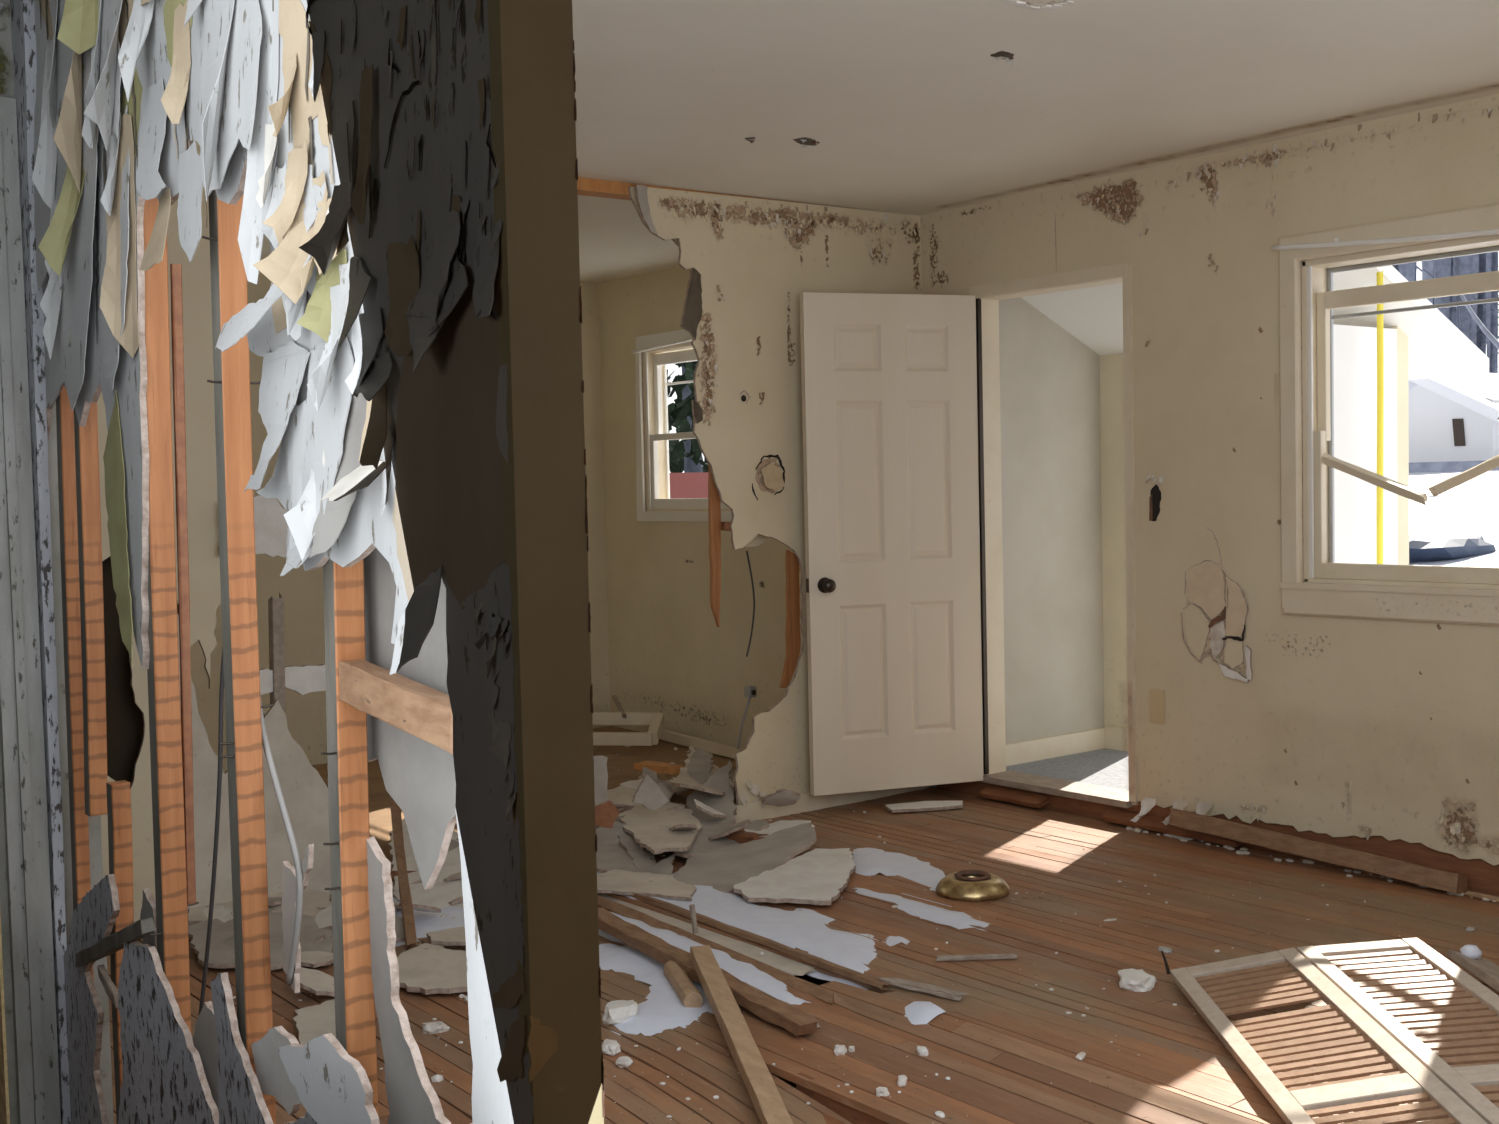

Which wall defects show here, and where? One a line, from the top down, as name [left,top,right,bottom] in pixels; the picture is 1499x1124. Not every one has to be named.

peeling [660,197,917,263]
leakage [901,224,948,289]
peeling [697,285,725,426]
peeling [32,0,525,968]
flaking render [752,454,785,501]
spalling [1146,474,1164,521]